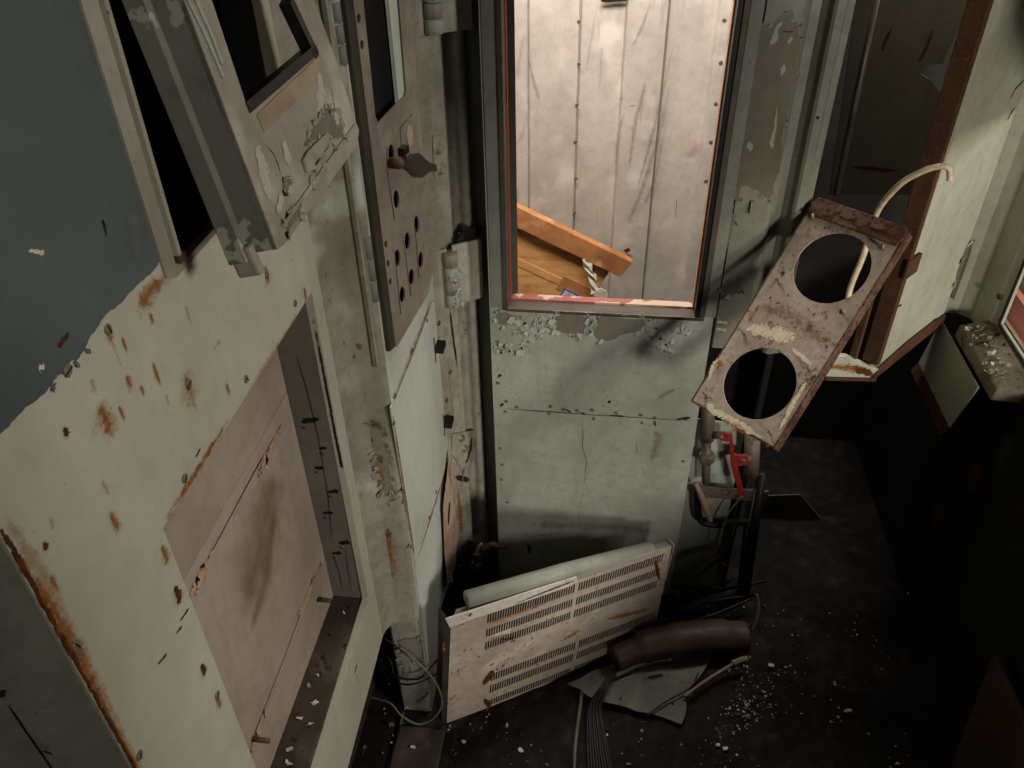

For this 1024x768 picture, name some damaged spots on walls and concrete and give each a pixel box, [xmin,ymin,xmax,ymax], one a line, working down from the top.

peeling [304,103,348,151]
peeling [723,10,805,250]
peeling [282,175,307,241]
rust [140,279,162,321]
peeling [493,310,693,357]
rust [99,407,125,432]
rust [178,422,228,501]
rust [0,529,139,768]